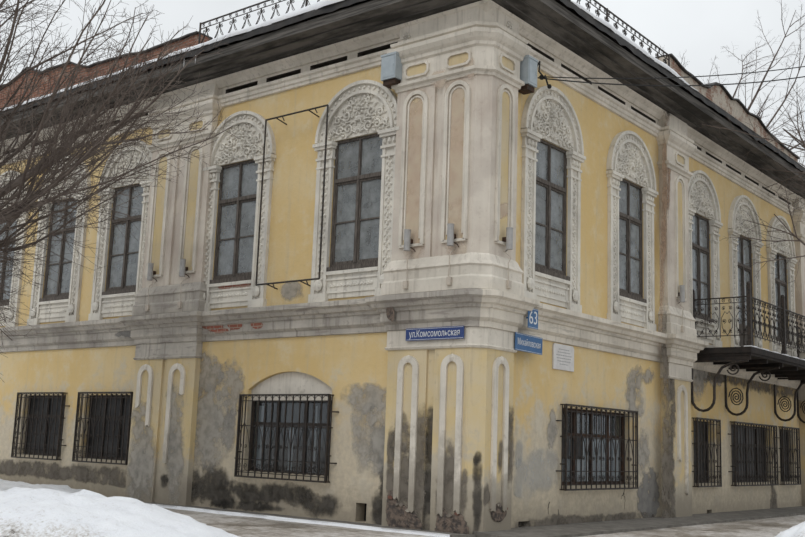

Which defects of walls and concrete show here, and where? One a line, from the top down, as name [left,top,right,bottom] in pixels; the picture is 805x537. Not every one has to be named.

flaking render [202,322,263,333]
water stain [0,405,154,498]
water stain [167,391,184,493]
water stain [191,466,337,516]
flaking render [386,491,423,530]
water stain [350,384,490,531]
flaking render [435,508,469,534]
water stain [498,411,514,480]
water stain [662,344,676,518]